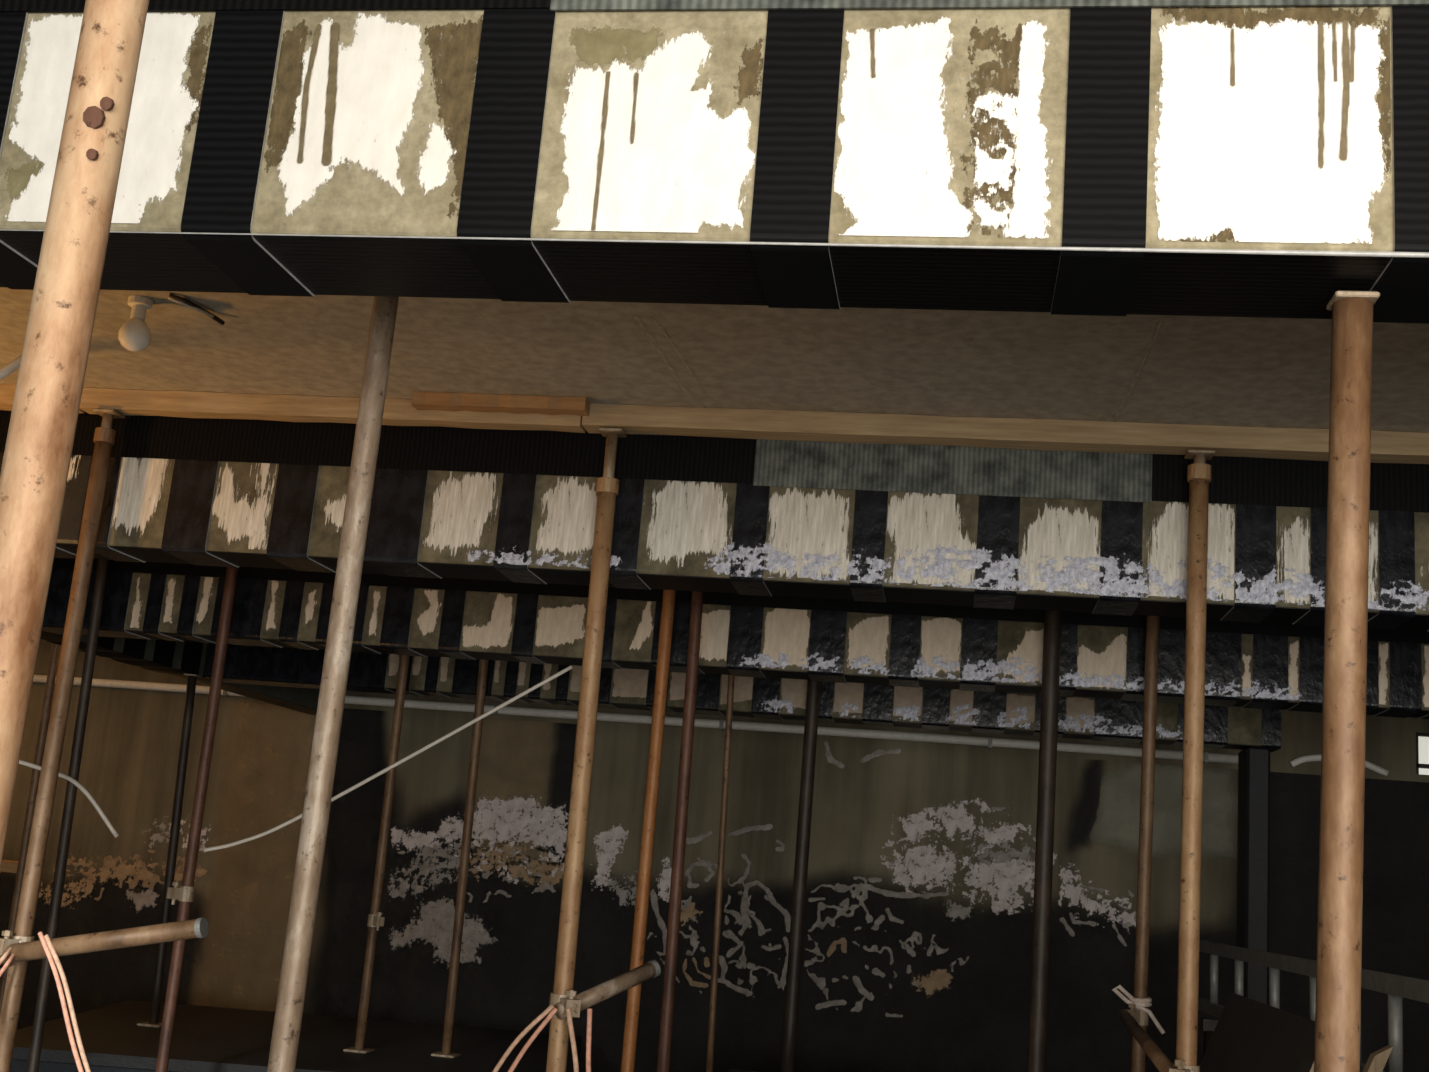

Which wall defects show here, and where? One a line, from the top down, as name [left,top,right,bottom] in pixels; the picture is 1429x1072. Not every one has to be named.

peeling [264,12,483,218]
peeling [834,17,1053,239]
leakage [308,708,577,1033]
leakage [572,874,1033,1072]
peeling [590,798,1036,1012]
leakage [1069,760,1102,847]
peeling [1053,853,1136,946]
leakage [1046,905,1179,1072]
leakage [1197,899,1237,1066]
leakage [1269,772,1321,1019]
leakage [1361,778,1429,981]
leakage [1361,988,1429,1072]